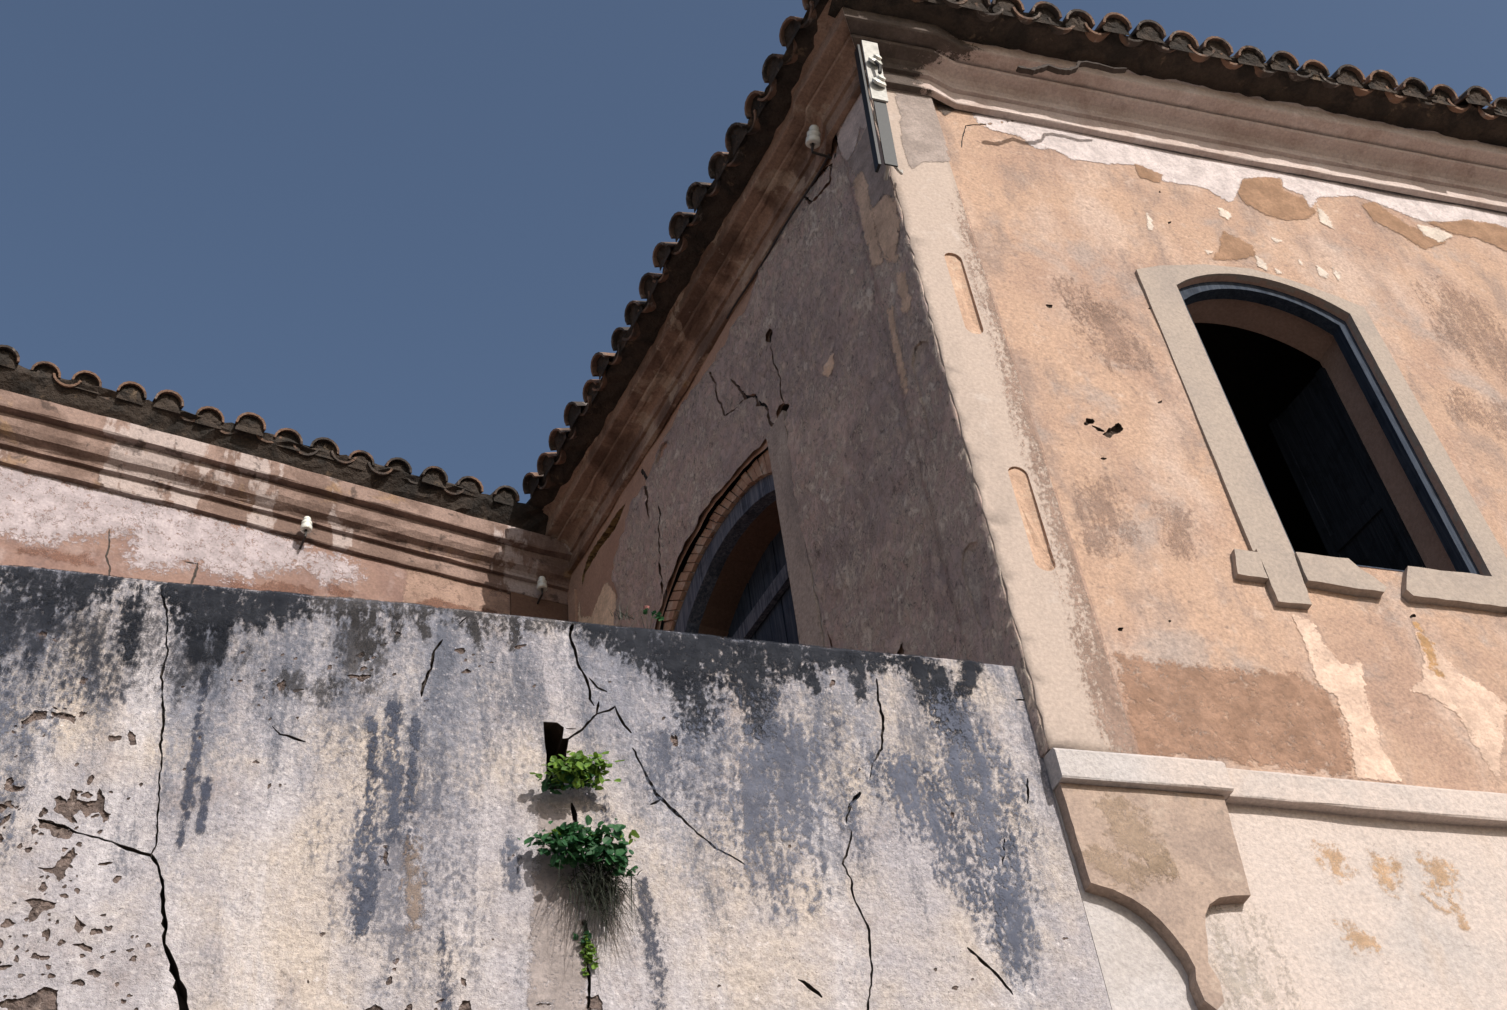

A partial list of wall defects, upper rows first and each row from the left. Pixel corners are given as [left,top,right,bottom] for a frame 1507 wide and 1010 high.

peeling [972,112,1507,274]
spalling [0,763,152,1010]
crack [38,561,199,1010]
water stain [174,671,213,847]
water stain [272,583,427,942]
water stain [634,876,672,1010]
crack [566,624,745,865]
crack [798,979,822,998]
water stain [640,688,1051,988]
crack [842,678,885,1010]
peeling [1292,614,1402,783]
peeling [1409,614,1507,777]